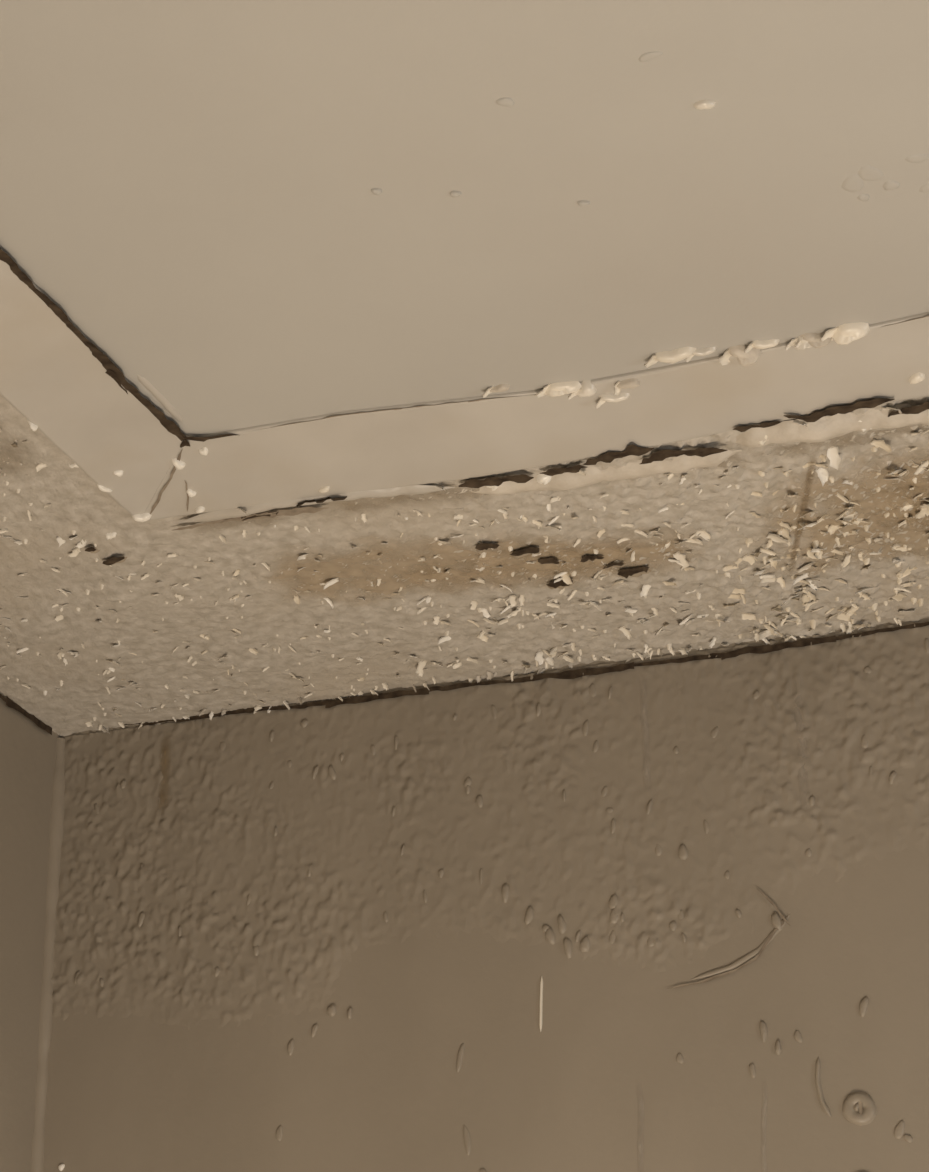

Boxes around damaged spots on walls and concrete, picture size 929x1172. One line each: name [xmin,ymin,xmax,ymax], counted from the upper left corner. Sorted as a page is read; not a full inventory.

peeling [644,322,870,368]
peeling [535,378,641,409]
crack [459,398,929,488]
peeling [0,460,271,639]
damp [278,542,674,594]
peeling [85,403,929,734]
damp [786,465,929,556]